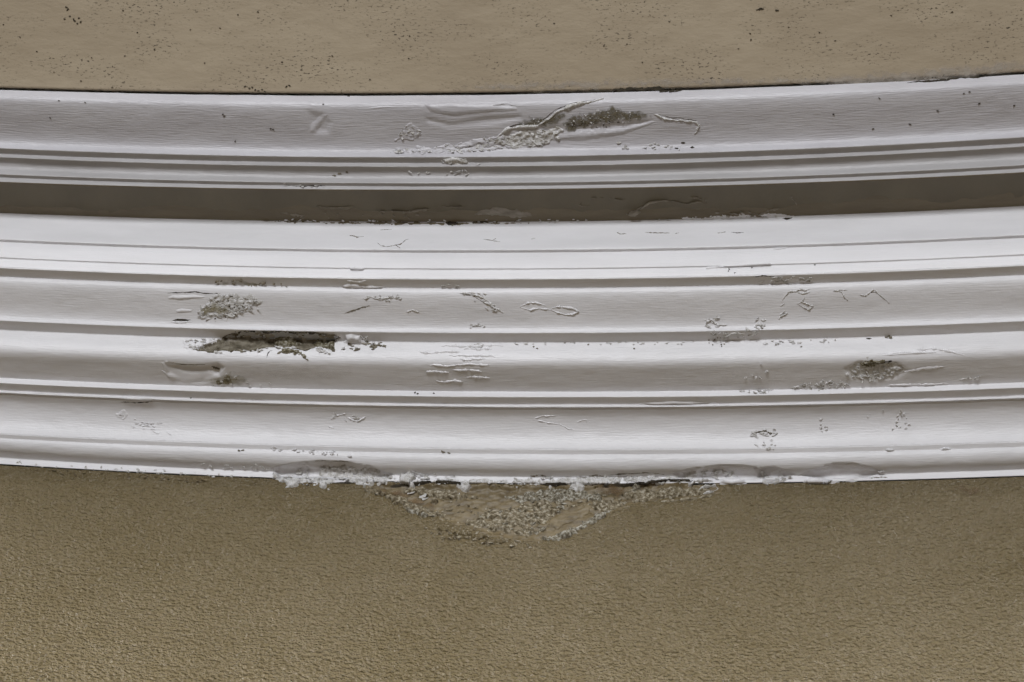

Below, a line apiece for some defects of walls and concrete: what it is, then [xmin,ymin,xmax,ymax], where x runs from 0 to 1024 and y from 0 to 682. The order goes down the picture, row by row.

peeling [390,98,657,155]
crack [460,292,579,315]
crack [778,288,889,319]
flaking render [183,330,386,360]
peeling [790,379,855,392]
flaking render [271,446,733,548]